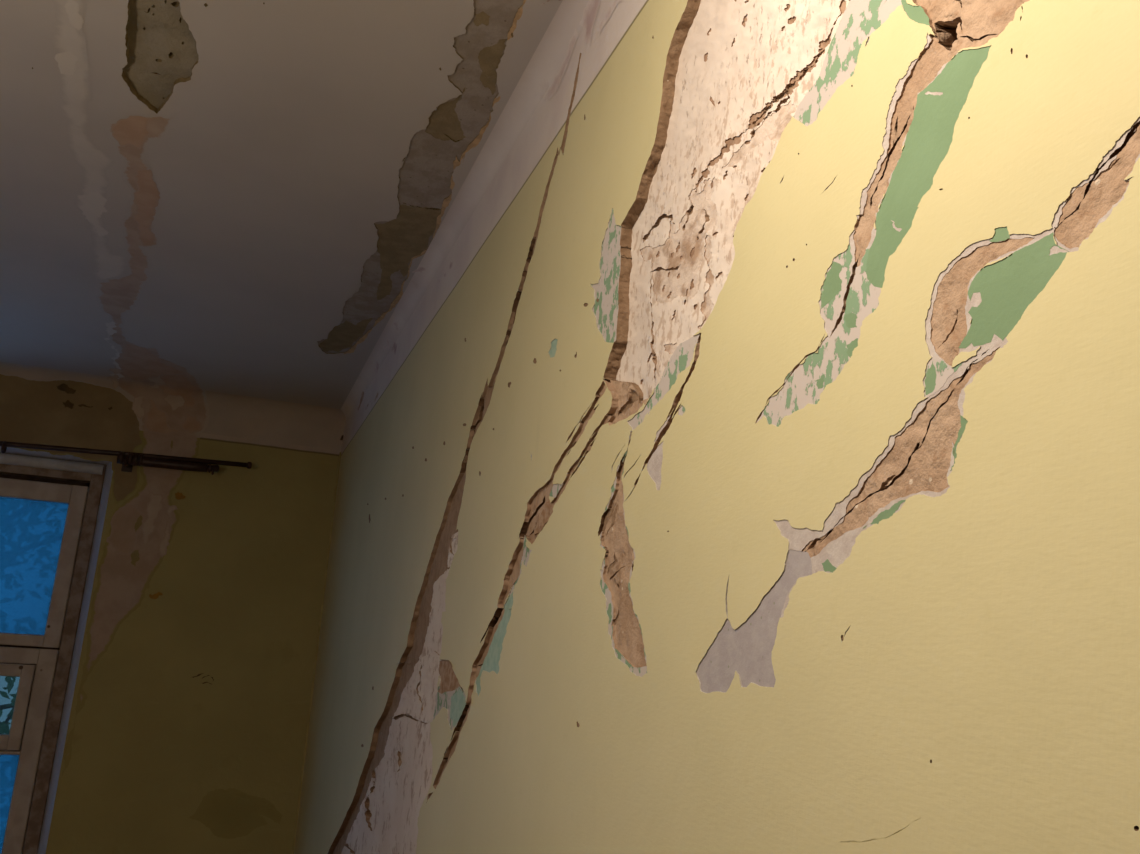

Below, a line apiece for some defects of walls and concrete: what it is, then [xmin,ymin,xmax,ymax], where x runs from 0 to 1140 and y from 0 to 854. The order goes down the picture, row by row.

leakage [0,373,144,504]
peeling [62,0,210,776]
peeling [317,0,526,354]
crack [328,53,701,854]
spalling [584,0,1030,677]